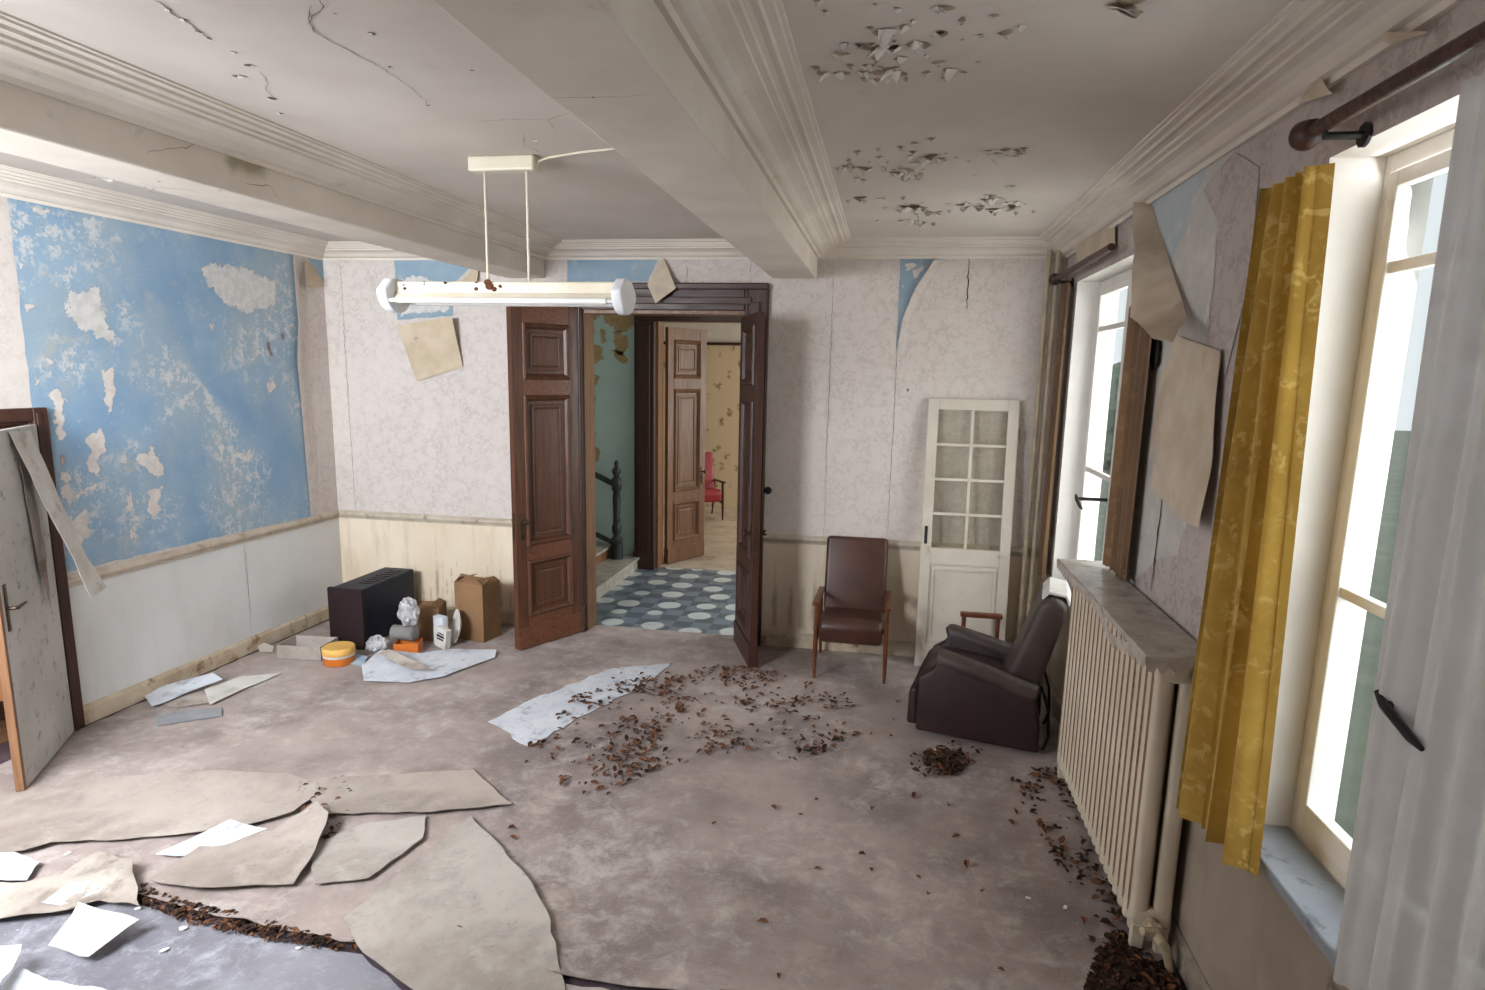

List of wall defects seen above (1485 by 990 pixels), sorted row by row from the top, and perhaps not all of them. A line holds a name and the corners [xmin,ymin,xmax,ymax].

crack [155,0,210,39]
crack [308,0,427,103]
peeling [809,3,1027,87]
peeling [1105,0,1145,19]
peeling [835,137,1035,228]
peeling [594,315,634,401]